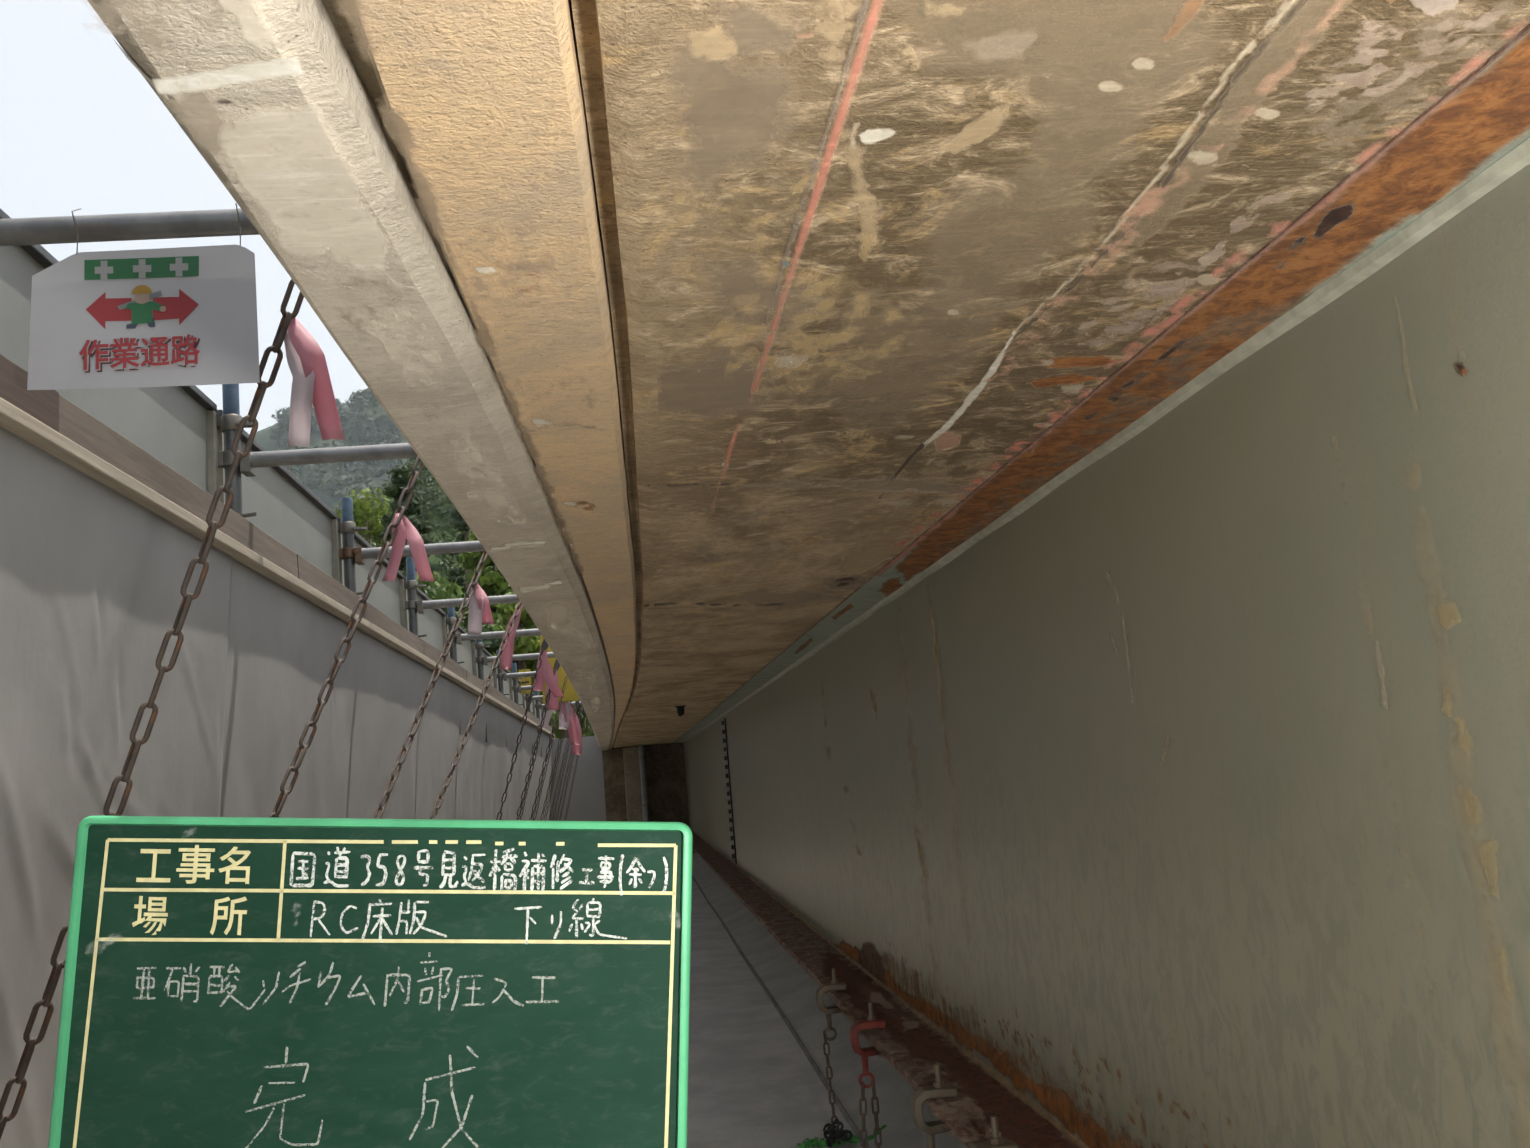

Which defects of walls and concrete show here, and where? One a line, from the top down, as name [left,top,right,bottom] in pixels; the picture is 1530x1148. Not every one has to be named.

corrosion [674,23,1530,743]
crack [879,0,1349,499]
corrosion [823,940,1208,1148]